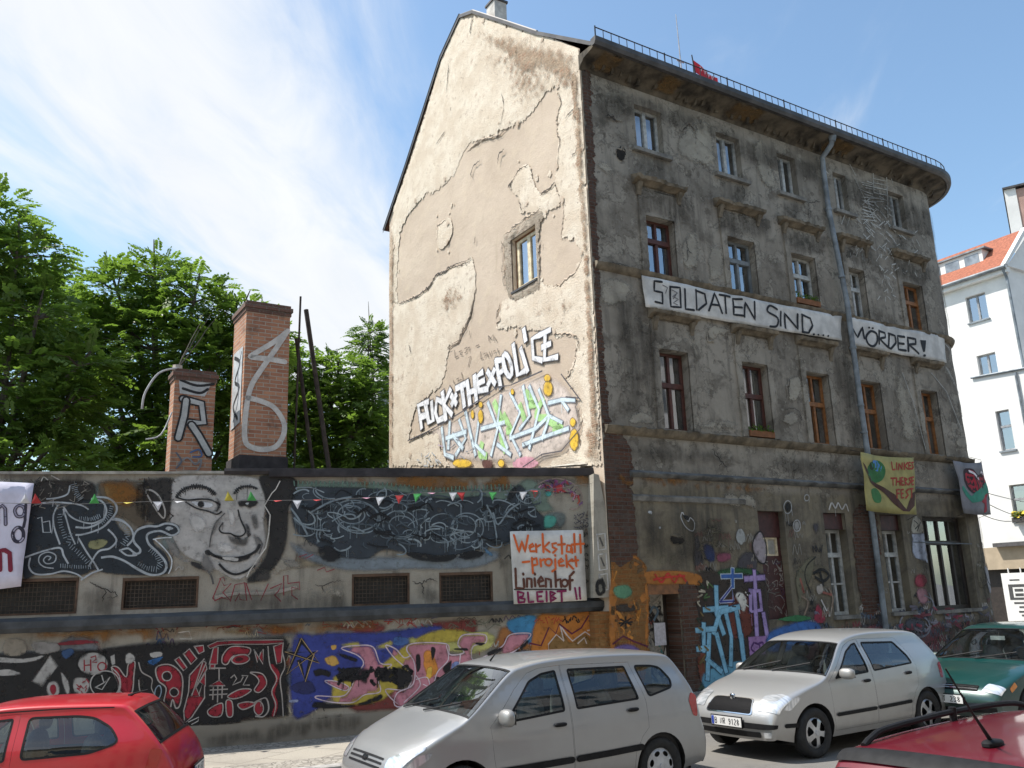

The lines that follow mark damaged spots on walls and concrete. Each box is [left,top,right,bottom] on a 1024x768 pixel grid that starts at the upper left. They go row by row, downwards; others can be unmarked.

peeling [389,16,653,651]